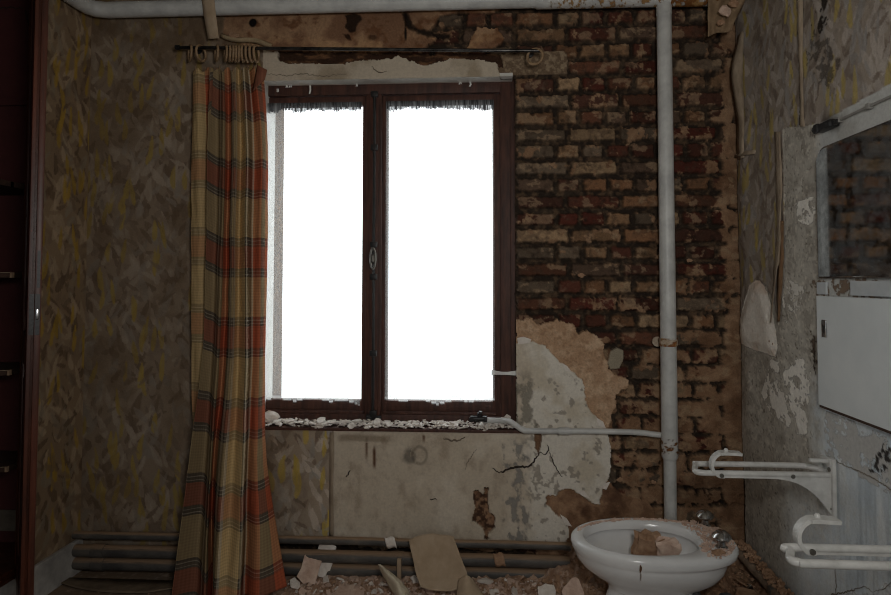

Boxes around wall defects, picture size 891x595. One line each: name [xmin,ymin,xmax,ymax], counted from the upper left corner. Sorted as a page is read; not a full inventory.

rust [551,0,719,9]
peeling [795,197,816,225]
spalling [224,7,664,556]
spalling [672,7,745,545]
peeling [761,330,818,435]
crack [493,445,562,477]
peeling [824,411,891,493]
crack [831,569,891,595]